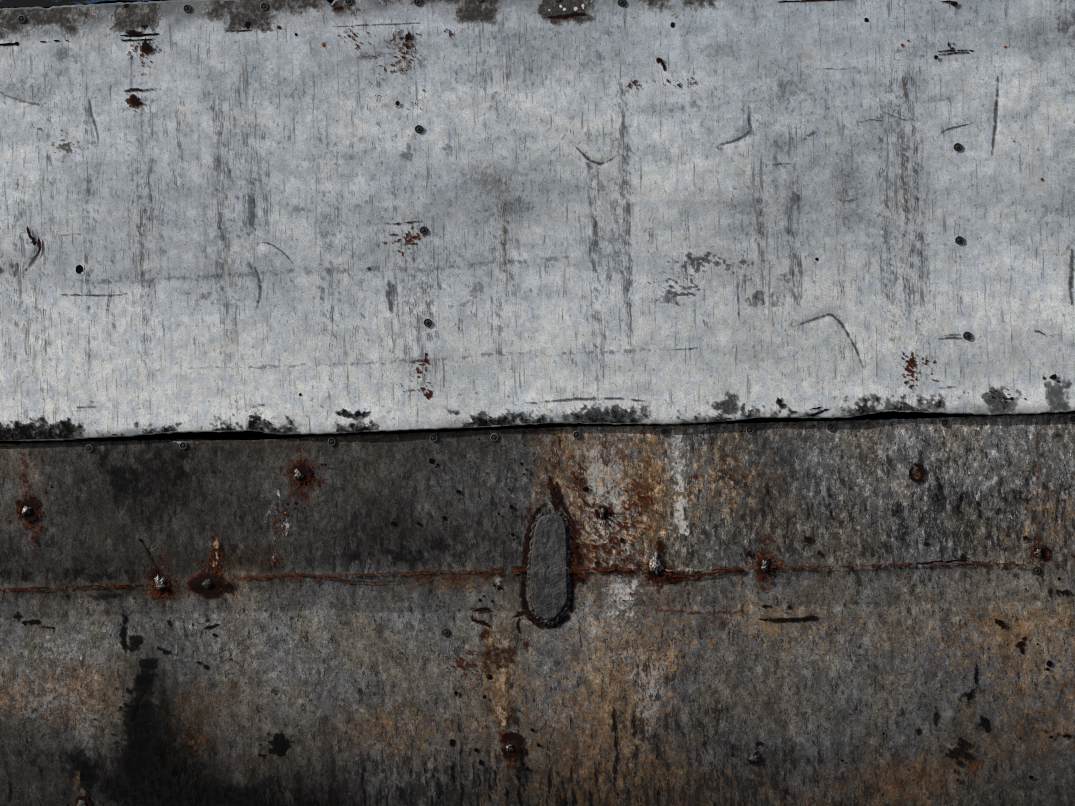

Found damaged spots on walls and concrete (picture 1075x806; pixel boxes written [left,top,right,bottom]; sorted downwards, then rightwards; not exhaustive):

peeling [196,0,365,32]
peeling [537,0,611,37]
corrosion [335,22,424,96]
peeling [0,408,124,440]
peeling [334,408,379,433]
peeling [447,396,650,441]
peeling [670,386,946,422]
peeling [981,386,1026,414]
corrosion [229,439,324,503]
corrosion [906,463,926,483]
corrosion [0,445,53,549]
corrosion [732,535,791,599]